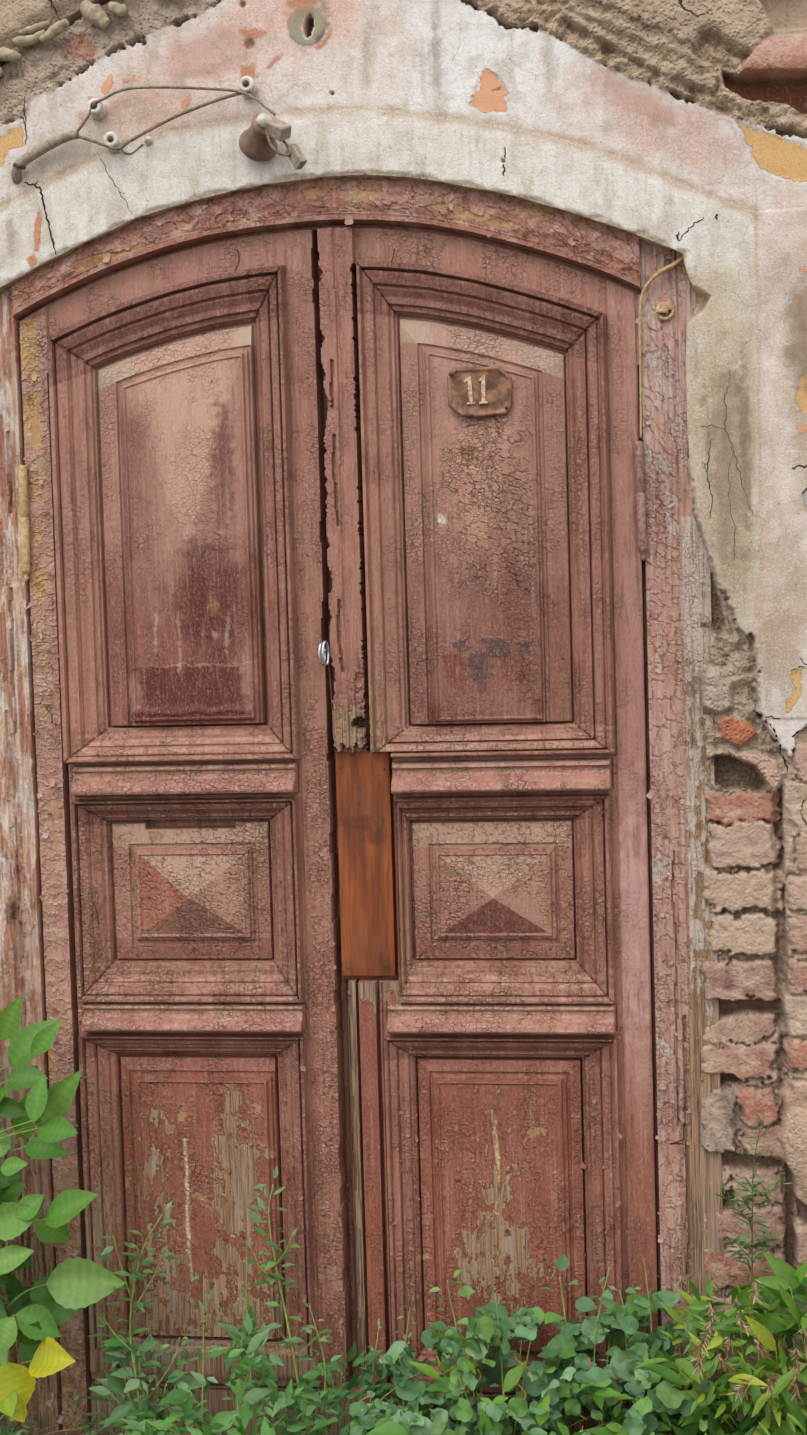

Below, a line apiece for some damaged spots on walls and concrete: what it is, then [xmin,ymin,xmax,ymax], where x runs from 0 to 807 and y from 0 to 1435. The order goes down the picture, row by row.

crack [19,97,27,144]
spalling [0,0,226,167]
peeling [469,68,509,113]
crack [24,182,56,255]
peeling [795,374,807,433]
flaking render [700,573,789,794]